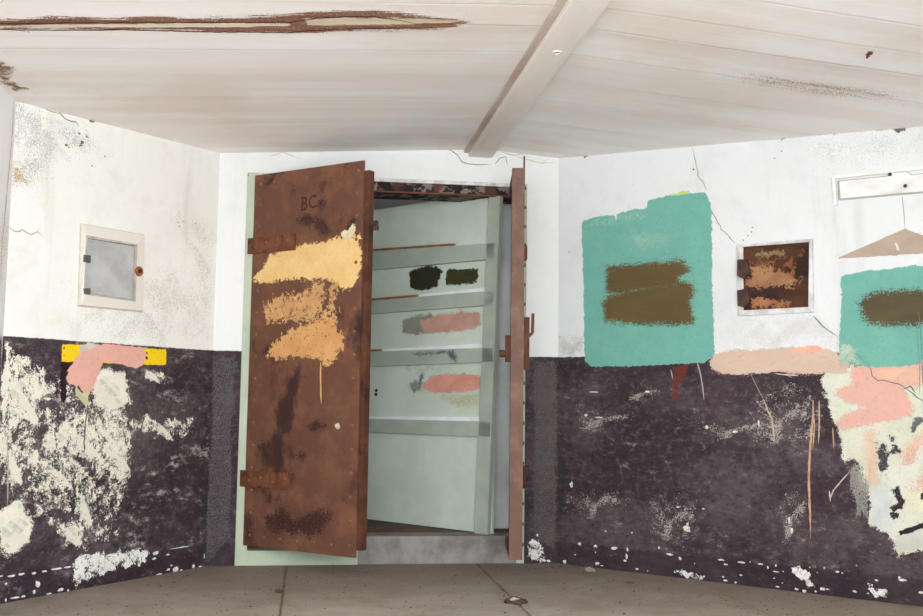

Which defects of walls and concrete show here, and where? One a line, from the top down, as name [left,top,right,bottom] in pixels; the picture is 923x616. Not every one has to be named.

corrosion [0,10,471,34]
corrosion [0,59,29,91]